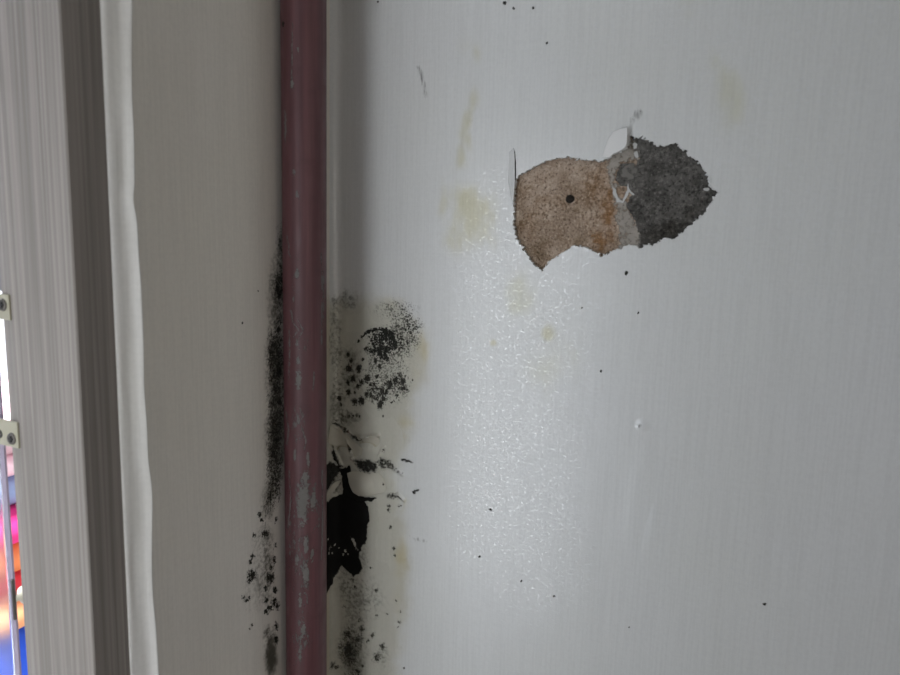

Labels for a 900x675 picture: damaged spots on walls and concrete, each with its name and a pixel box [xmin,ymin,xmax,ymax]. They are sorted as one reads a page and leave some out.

spalling [508,127,717,271]
leakage [337,305,418,418]
leakage [247,270,284,674]
leakage [327,420,413,592]
leakage [331,619,374,675]